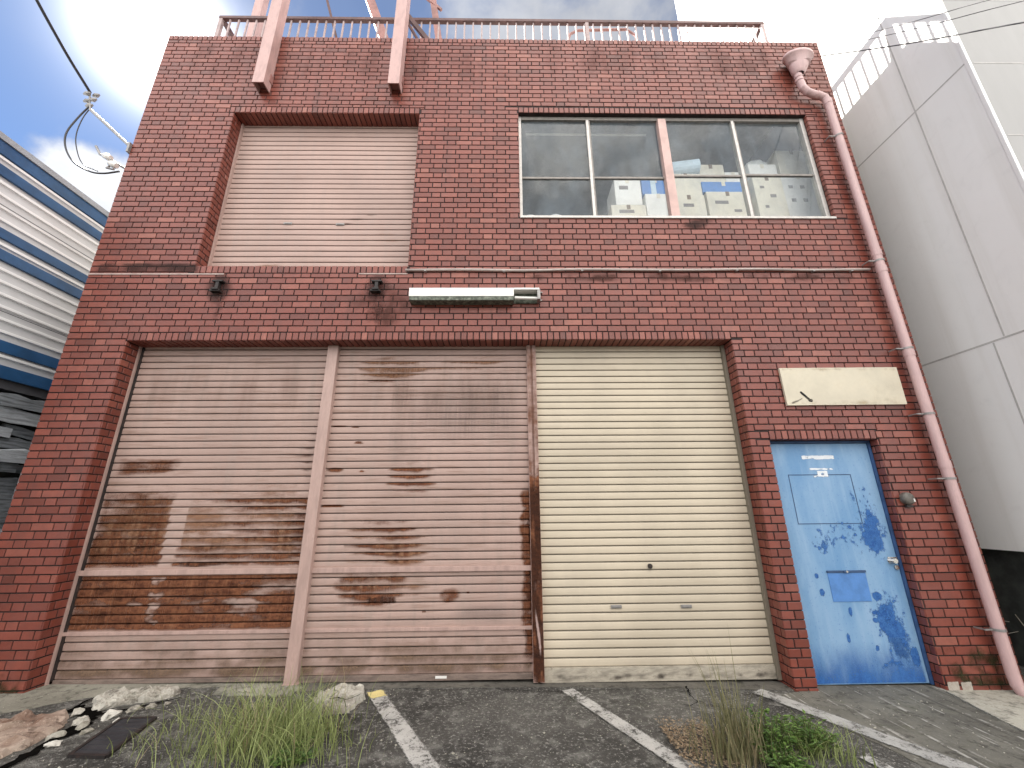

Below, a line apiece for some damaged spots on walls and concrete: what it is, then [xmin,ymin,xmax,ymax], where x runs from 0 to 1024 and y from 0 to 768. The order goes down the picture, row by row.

corrosion [361,358,444,381]
corrosion [121,460,180,474]
corrosion [387,468,433,491]
peeling [813,488,887,554]
corrosion [68,491,308,631]
corrosion [335,528,423,606]
corrosion [441,590,469,602]
corrosion [519,460,545,682]
peeling [869,592,921,668]